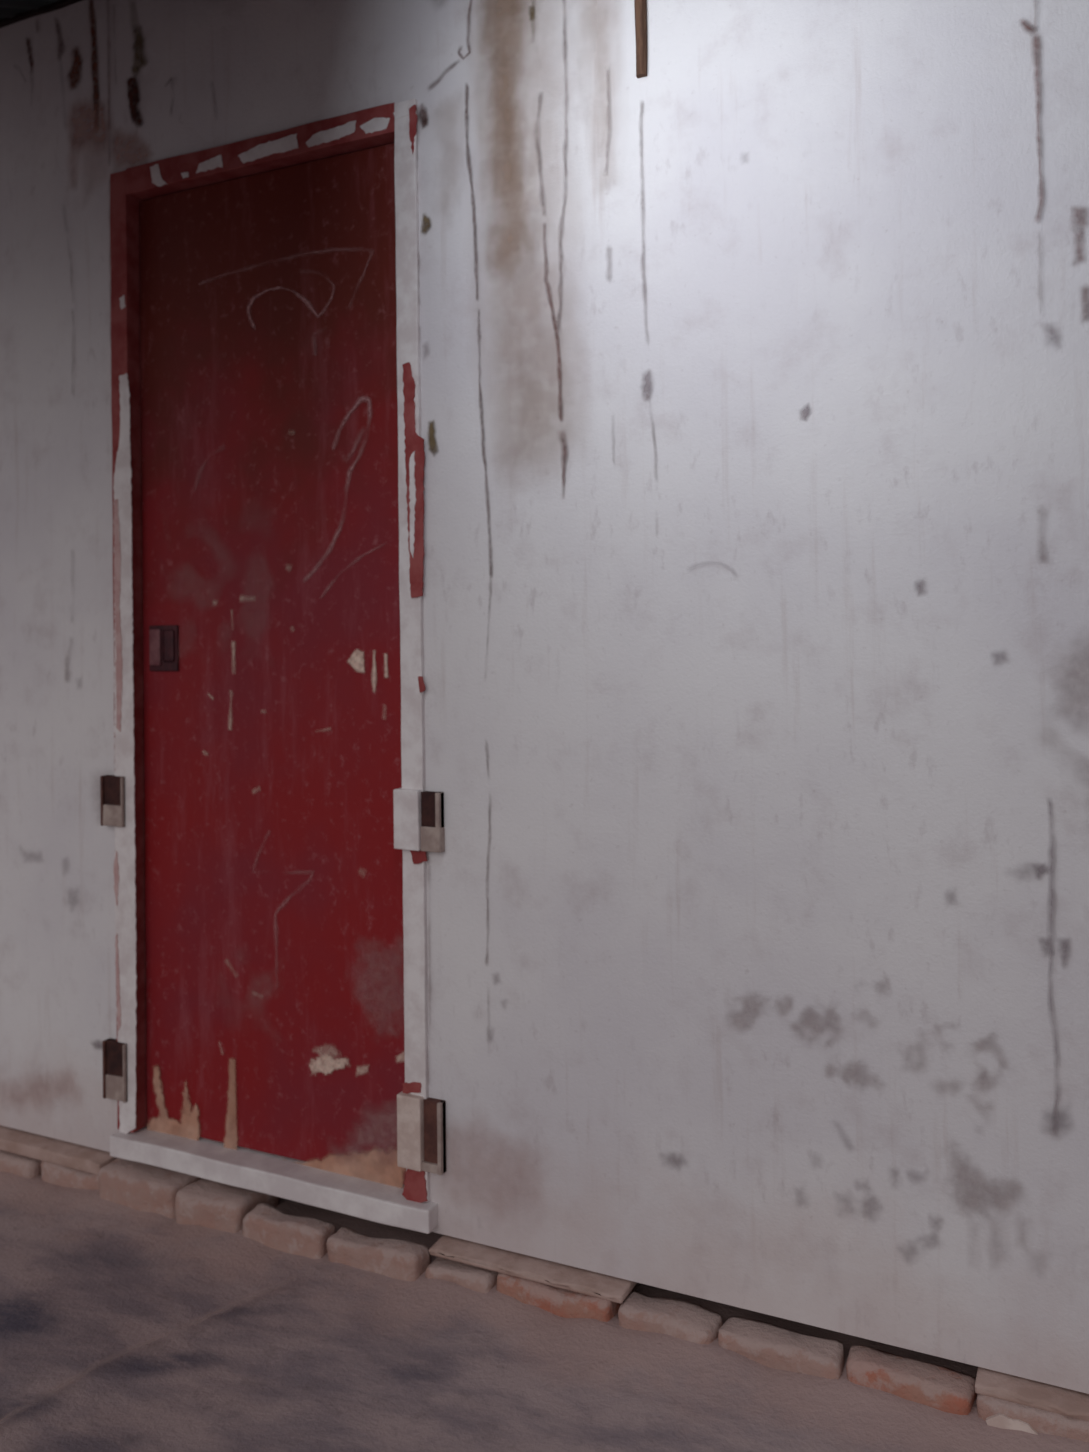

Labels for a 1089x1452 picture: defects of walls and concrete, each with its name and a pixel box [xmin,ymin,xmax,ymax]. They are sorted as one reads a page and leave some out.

crack [1037,802,1067,958]